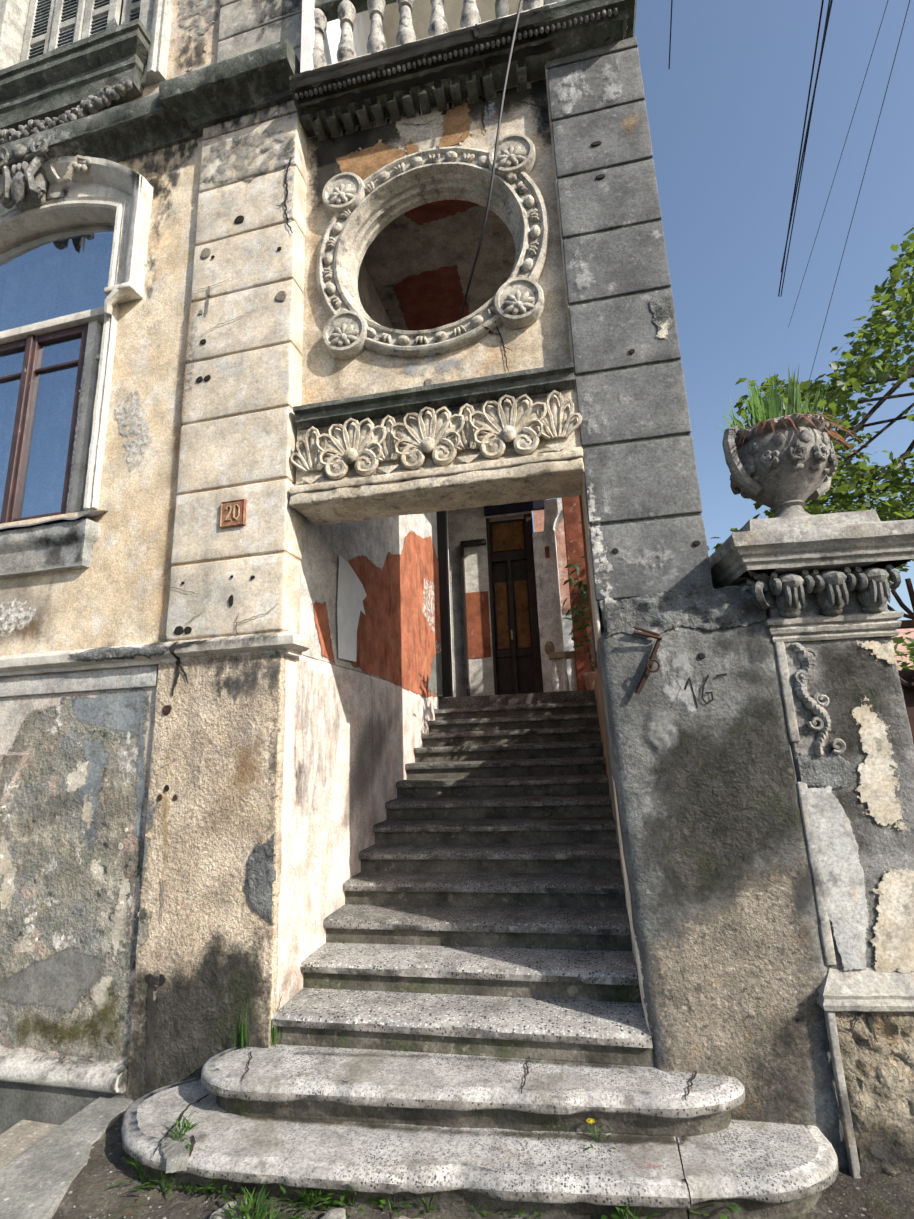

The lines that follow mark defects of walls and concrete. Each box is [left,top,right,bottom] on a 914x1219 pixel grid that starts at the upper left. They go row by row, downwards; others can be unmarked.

damp [199,0,301,134]
peeling [336,86,474,181]
crack [169,587,278,696]
peeling [349,529,441,698]
peeling [295,601,340,817]
peeling [0,686,178,1070]
spalling [244,832,276,925]
peeling [602,640,914,1125]
crack [153,1094,209,1157]
damp [112,936,272,1101]
crack [521,1057,530,1094]
crack [685,1071,697,1100]